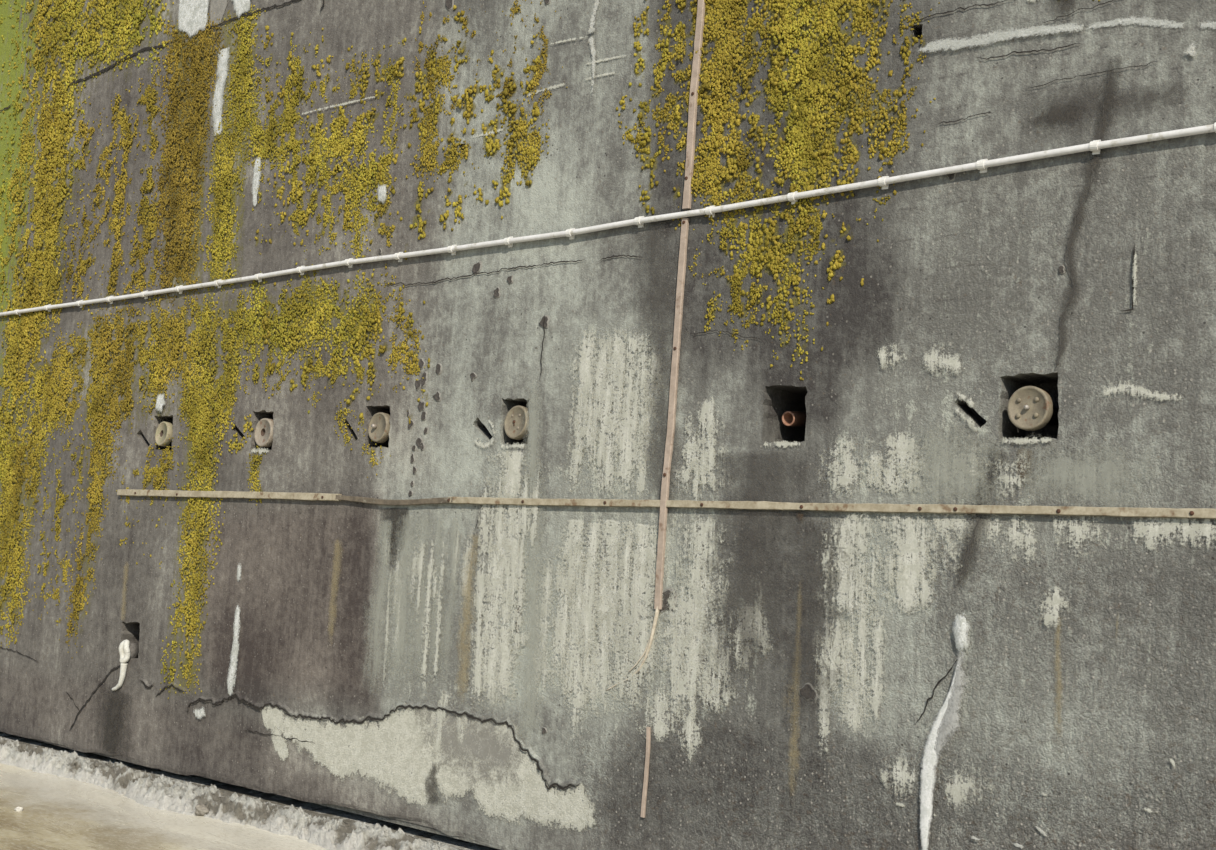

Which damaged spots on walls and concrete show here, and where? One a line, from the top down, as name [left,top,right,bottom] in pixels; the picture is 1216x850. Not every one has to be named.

crack [69,43,169,85]
crack [200,0,324,30]
crack [918,0,1006,20]
crack [977,0,1156,369]
leakage [558,327,664,498]
leakage [227,606,240,695]
leakage [369,393,773,763]
leakage [812,425,1127,752]
leakage [1131,506,1216,550]
crack [65,664,582,790]
spalling [260,691,597,832]
leakage [881,756,916,794]